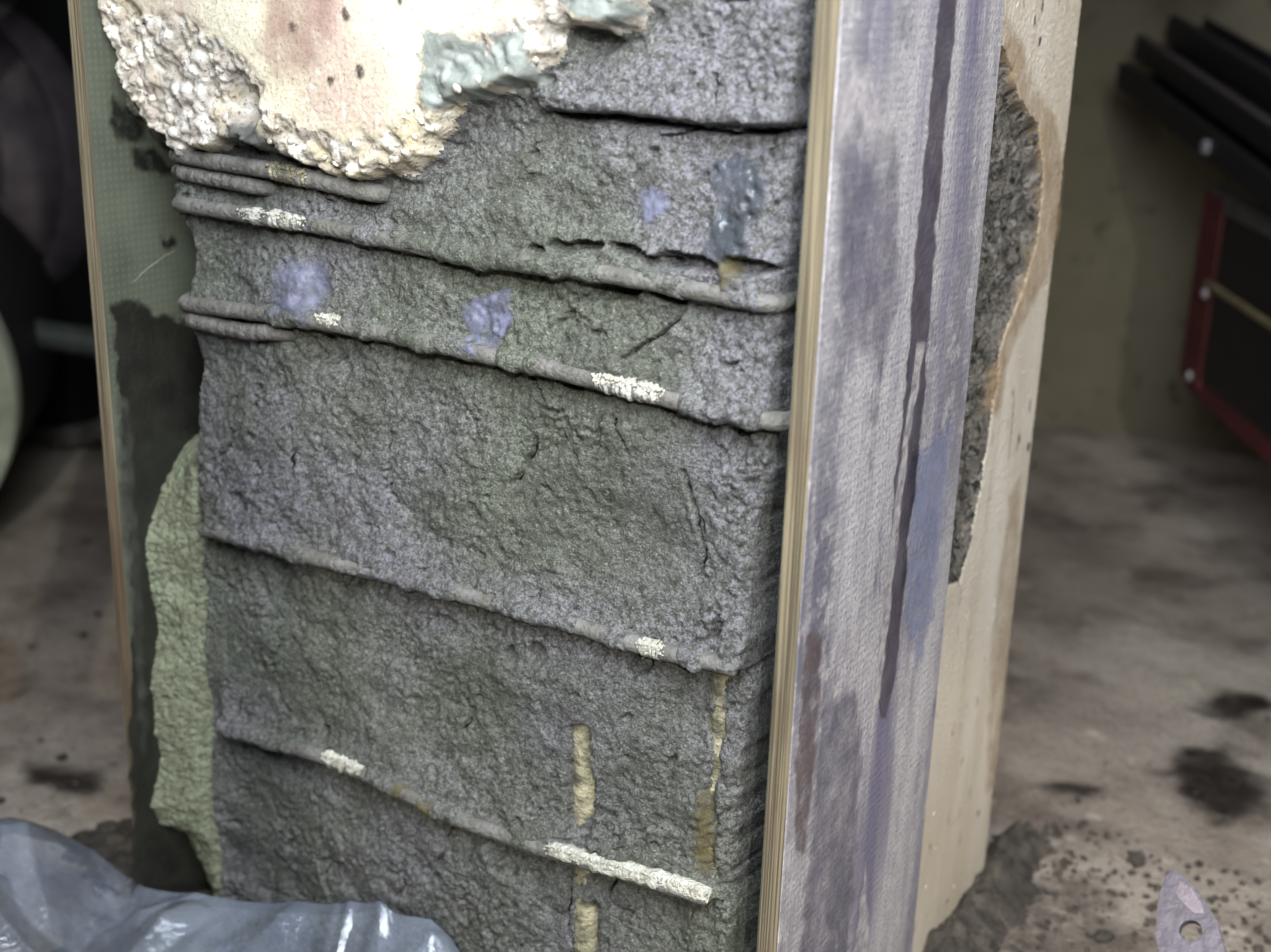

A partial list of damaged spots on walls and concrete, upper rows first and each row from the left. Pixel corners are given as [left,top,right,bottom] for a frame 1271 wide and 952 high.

water stain [236,207,306,231]
spalling [948,40,1043,585]
water stain [591,373,665,405]
spalling [97,0,816,952]
crack [687,480,708,564]
water stain [321,749,364,776]
water stain [543,842,714,904]